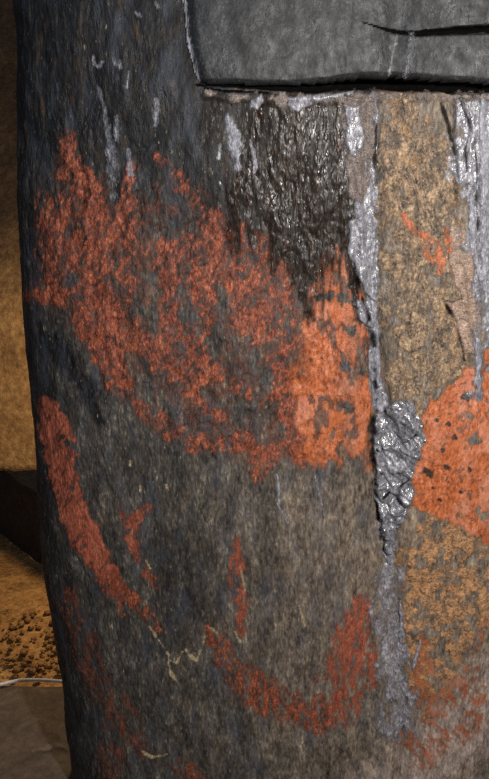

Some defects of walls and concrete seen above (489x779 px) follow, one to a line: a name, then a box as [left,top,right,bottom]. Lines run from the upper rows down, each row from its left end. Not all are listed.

crack [362,21,489,36]
corrosion [23,130,376,483]
leakage [210,91,388,413]
corrosion [401,212,452,275]
leakage [446,92,489,402]
corrosion [35,395,162,633]
corrosion [228,537,249,638]
corrosion [205,595,378,735]
efflorescence [369,519,421,751]
corrosion [411,348,489,545]